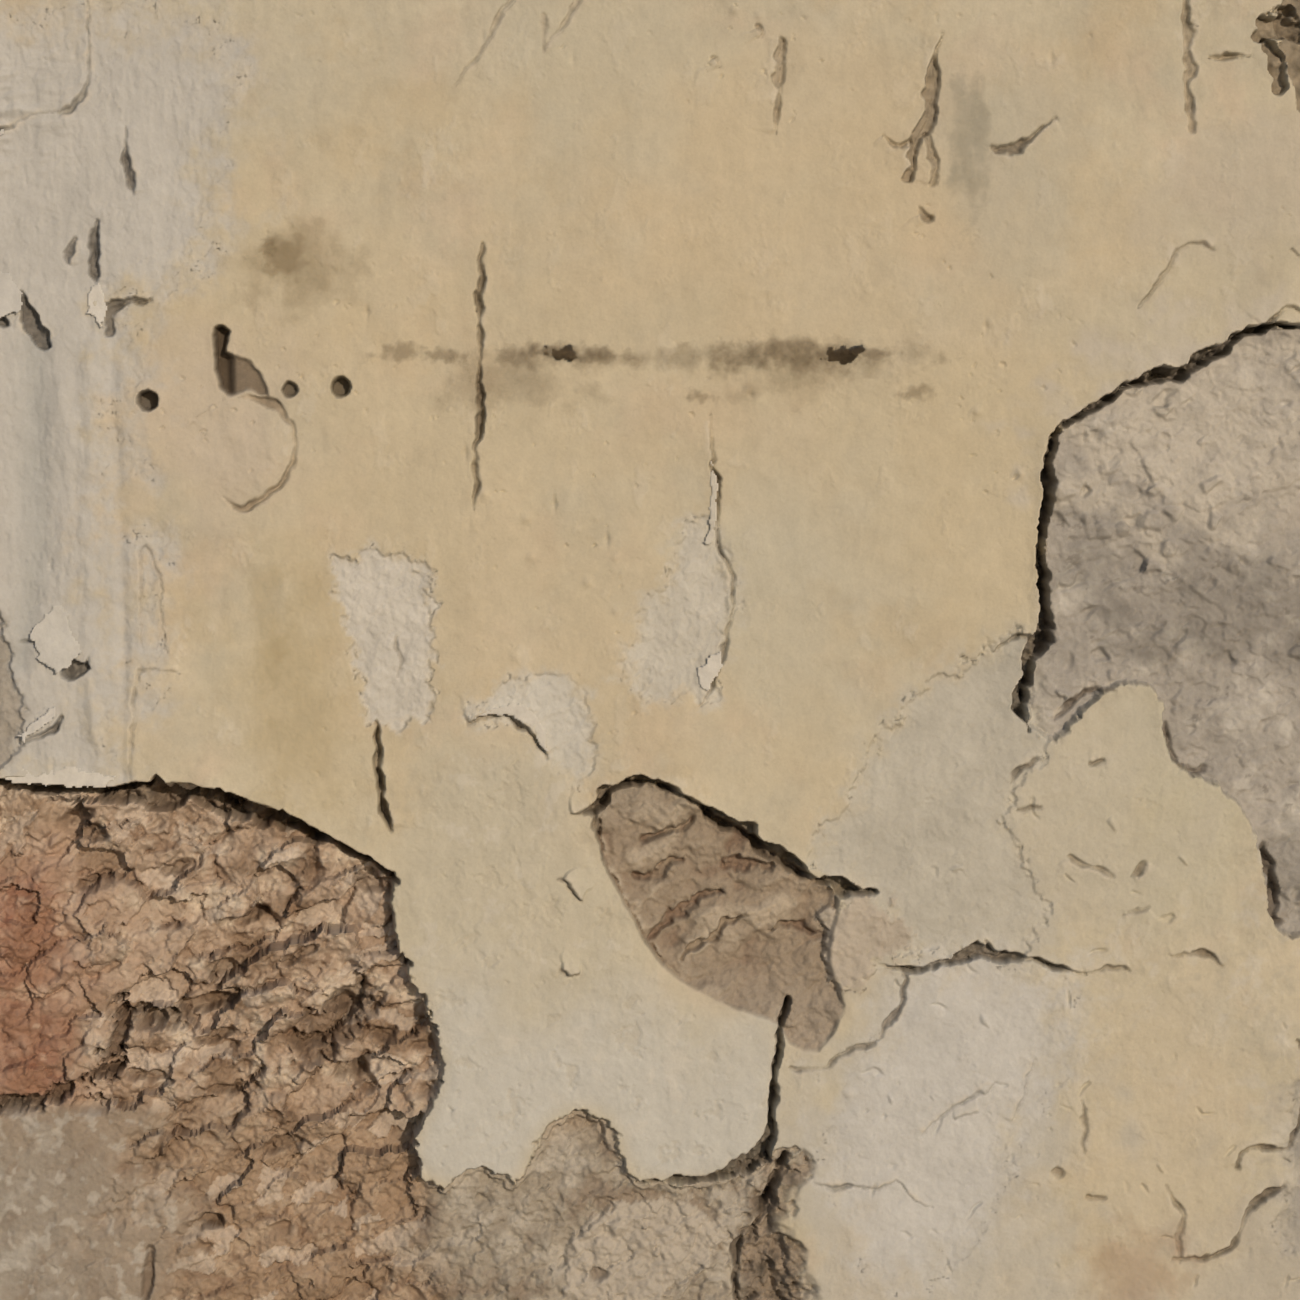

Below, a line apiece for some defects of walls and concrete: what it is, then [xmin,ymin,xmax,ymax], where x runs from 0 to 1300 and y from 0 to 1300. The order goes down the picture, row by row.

spalling [0,0,817,1300]
crack [472,243,487,509]
peeling [601,328,1300,1052]
crack [992,304,1300,734]
crack [1139,241,1217,307]
crack [636,940,1133,1300]
peeling [818,958,1080,1287]
crack [1168,949,1226,969]
crack [1172,1108,1300,1264]